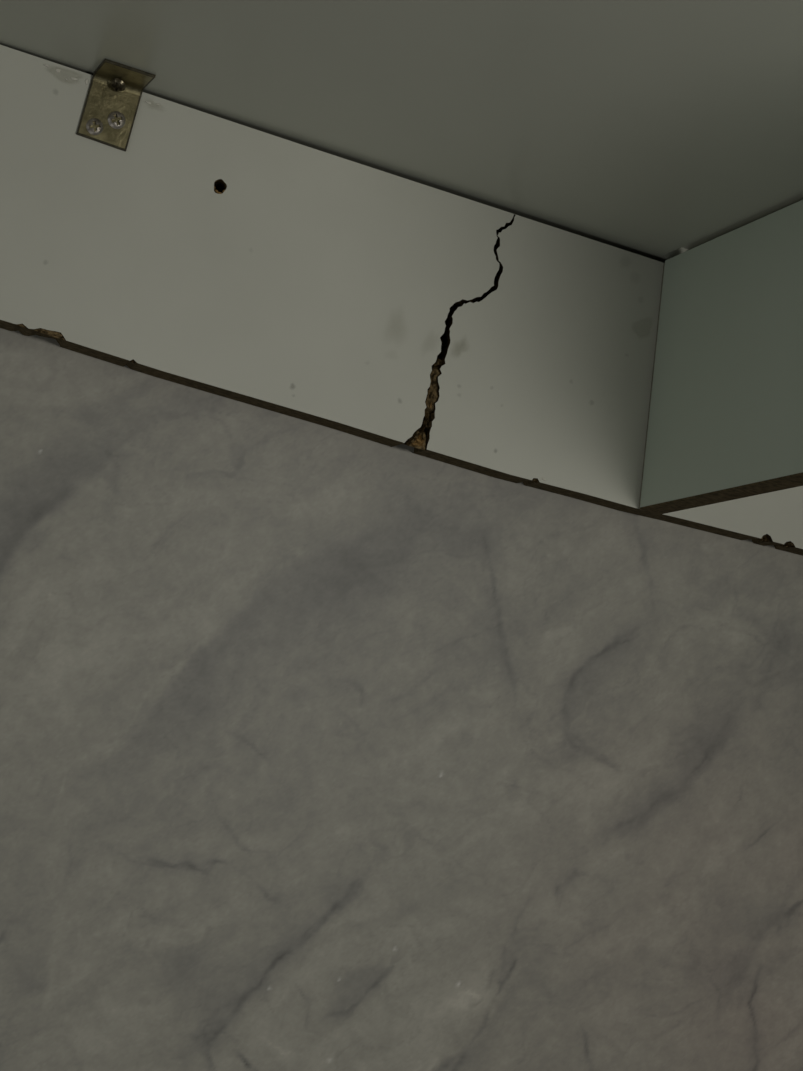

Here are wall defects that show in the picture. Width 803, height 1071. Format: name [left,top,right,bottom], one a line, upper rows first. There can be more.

crack [403,215,515,450]